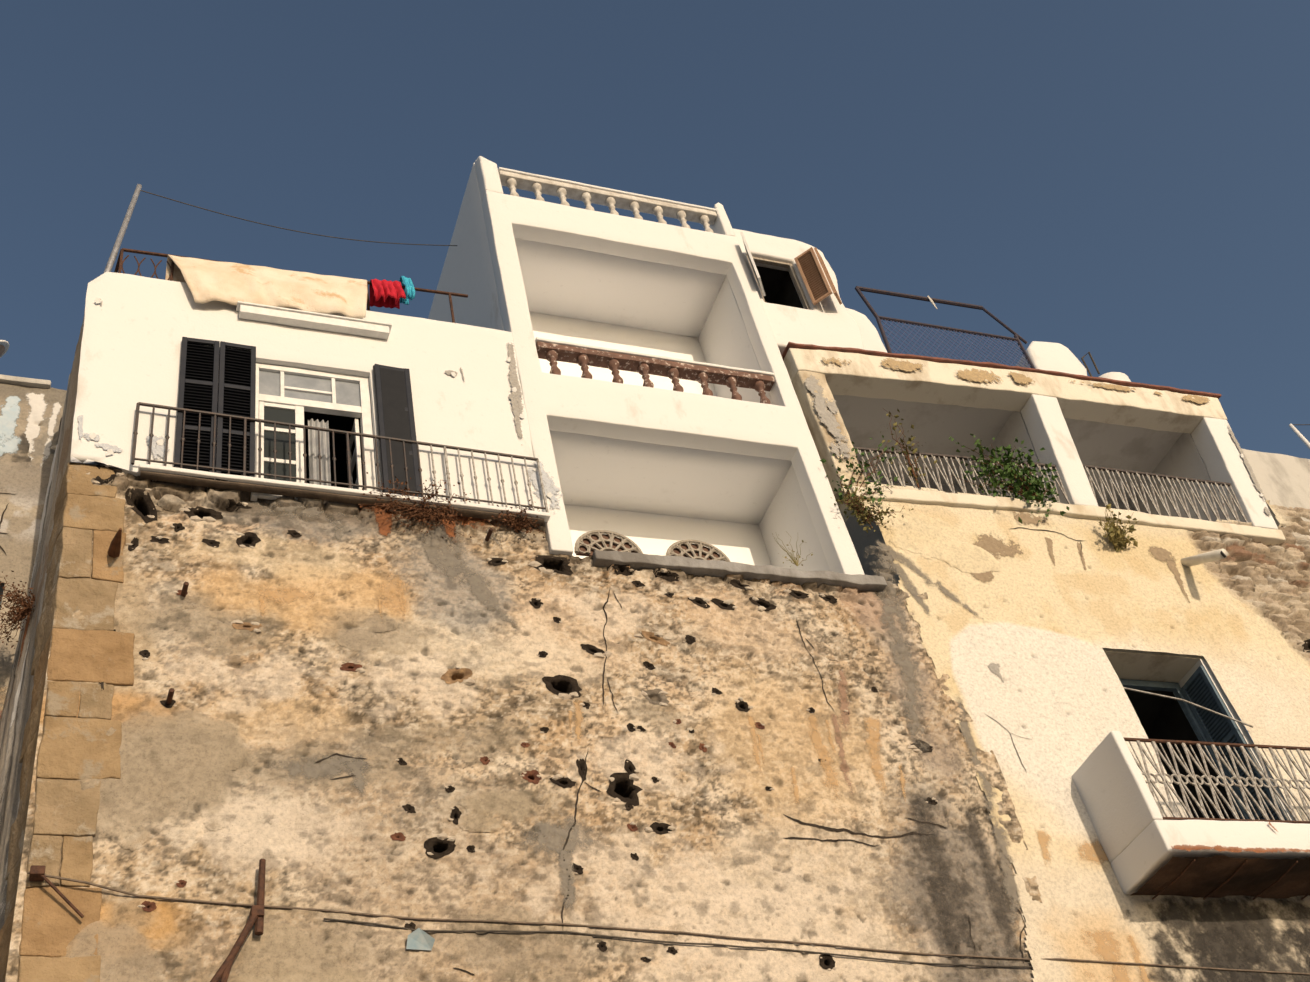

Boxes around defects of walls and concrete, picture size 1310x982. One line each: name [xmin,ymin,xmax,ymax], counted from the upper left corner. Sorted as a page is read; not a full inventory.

crack [0,493,11,554]
peeling [0,392,62,591]
peeling [0,639,30,728]
crack [602,590,622,713]
crack [561,752,602,923]